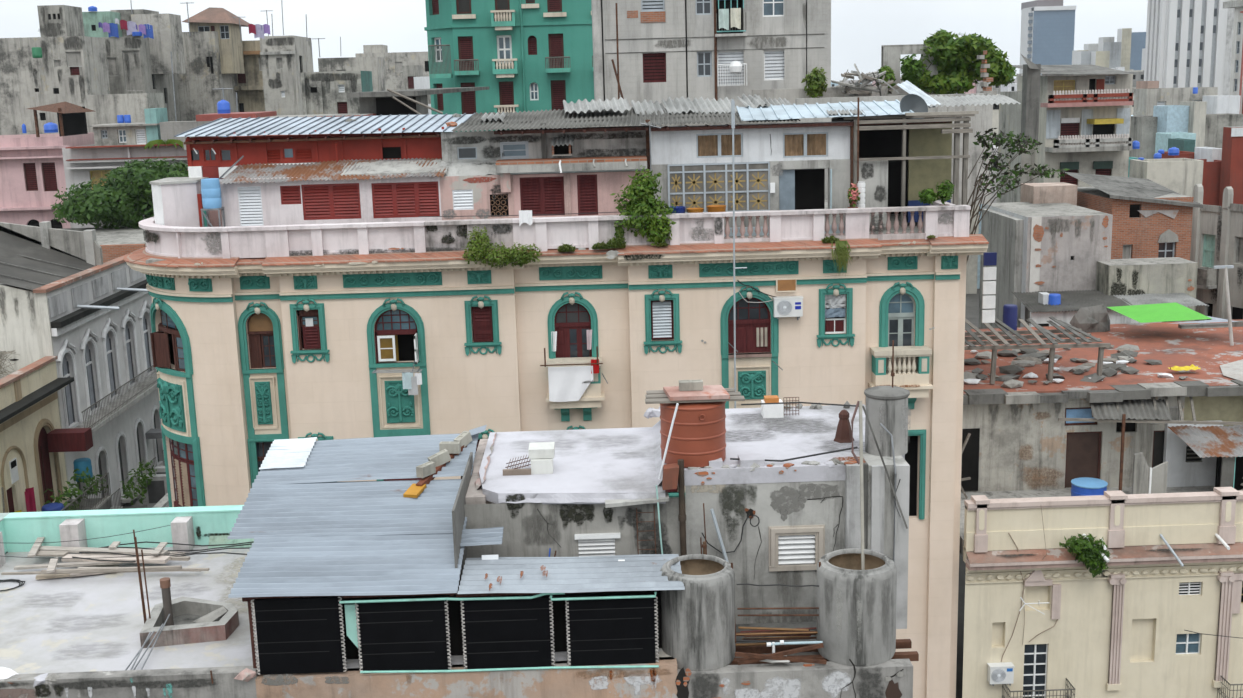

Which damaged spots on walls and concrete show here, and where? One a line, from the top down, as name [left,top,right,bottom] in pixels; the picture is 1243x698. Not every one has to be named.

peeling [688,458,857,521]
damp [506,494,671,554]
peeling [589,676,608,690]
peeling [624,673,659,695]
spalling [675,668,692,698]